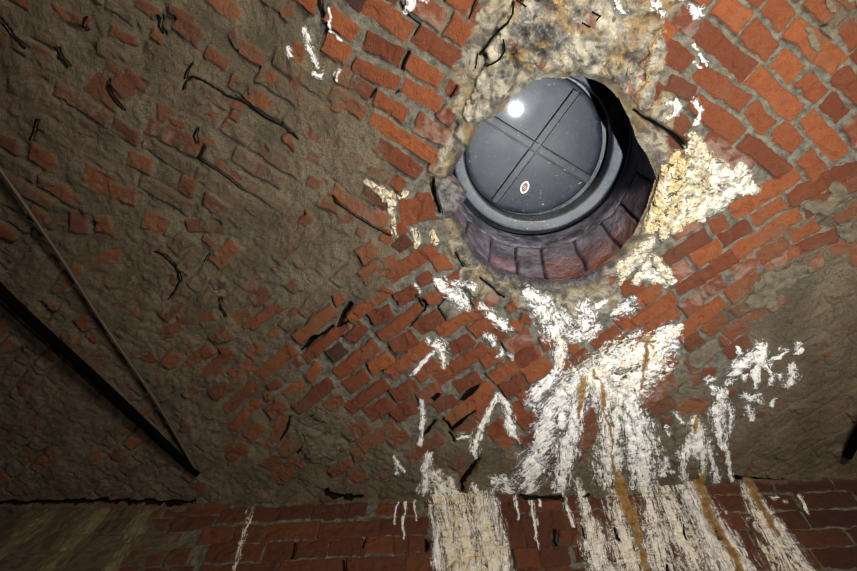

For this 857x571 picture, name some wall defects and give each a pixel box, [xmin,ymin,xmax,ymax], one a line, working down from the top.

crack [156,14,165,34]
crack [479,0,527,67]
spalling [463,0,676,122]
damp [679,0,705,20]
crack [182,63,298,139]
damp [363,178,409,239]
spalling [434,174,467,215]
damp [393,97,815,571]
rust [639,336,656,390]
rust [577,369,651,571]
peeling [652,424,688,453]
rust [693,473,744,571]